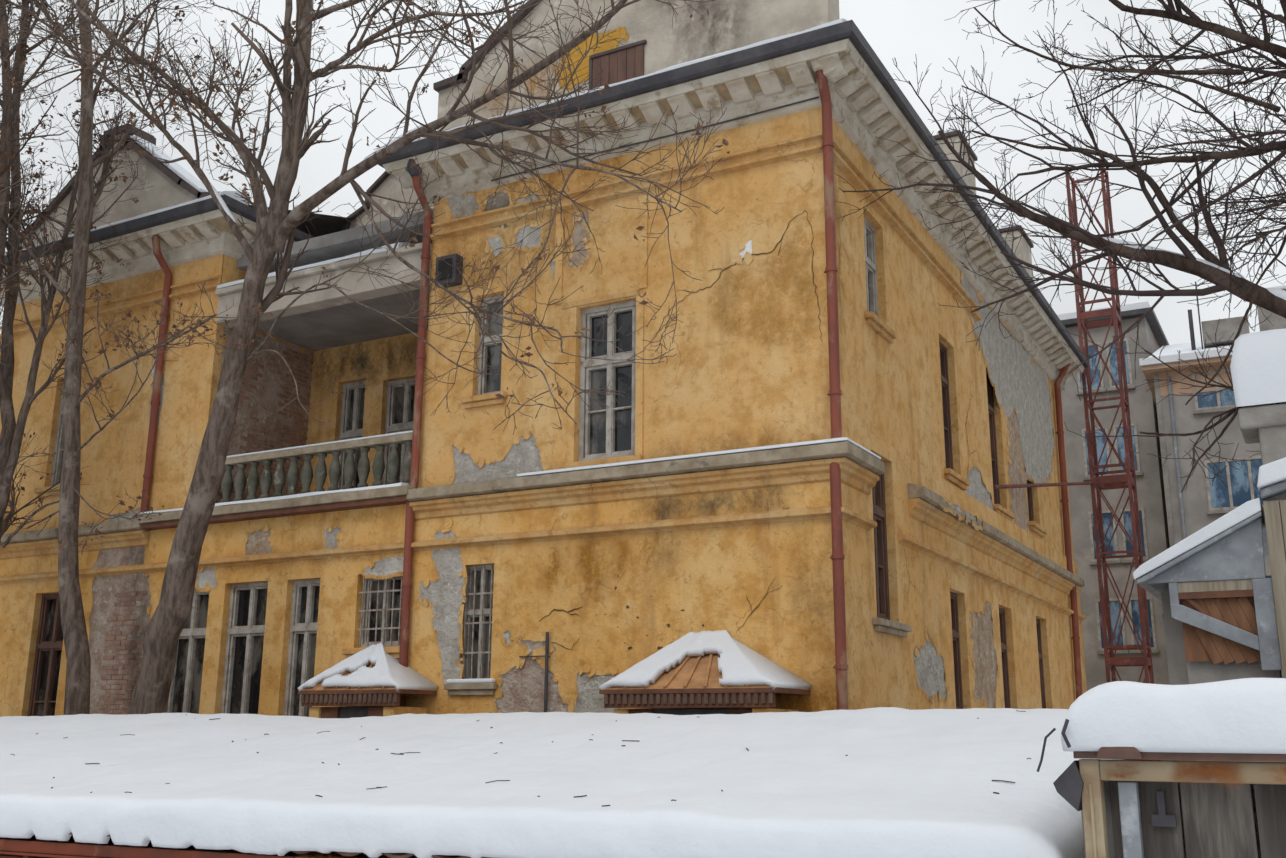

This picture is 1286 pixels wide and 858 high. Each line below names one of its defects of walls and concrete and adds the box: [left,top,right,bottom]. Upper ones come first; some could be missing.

flaking render [444,185,592,280]
crack [634,203,850,355]
flaking render [940,272,1055,532]
flaking render [449,429,549,484]
flaking render [243,524,276,566]
flaking render [87,546,152,715]
flaking render [362,518,467,684]
flaking render [486,630,624,713]
crack [737,578,783,631]
flaking render [913,626,948,704]
flaking render [969,598,998,708]